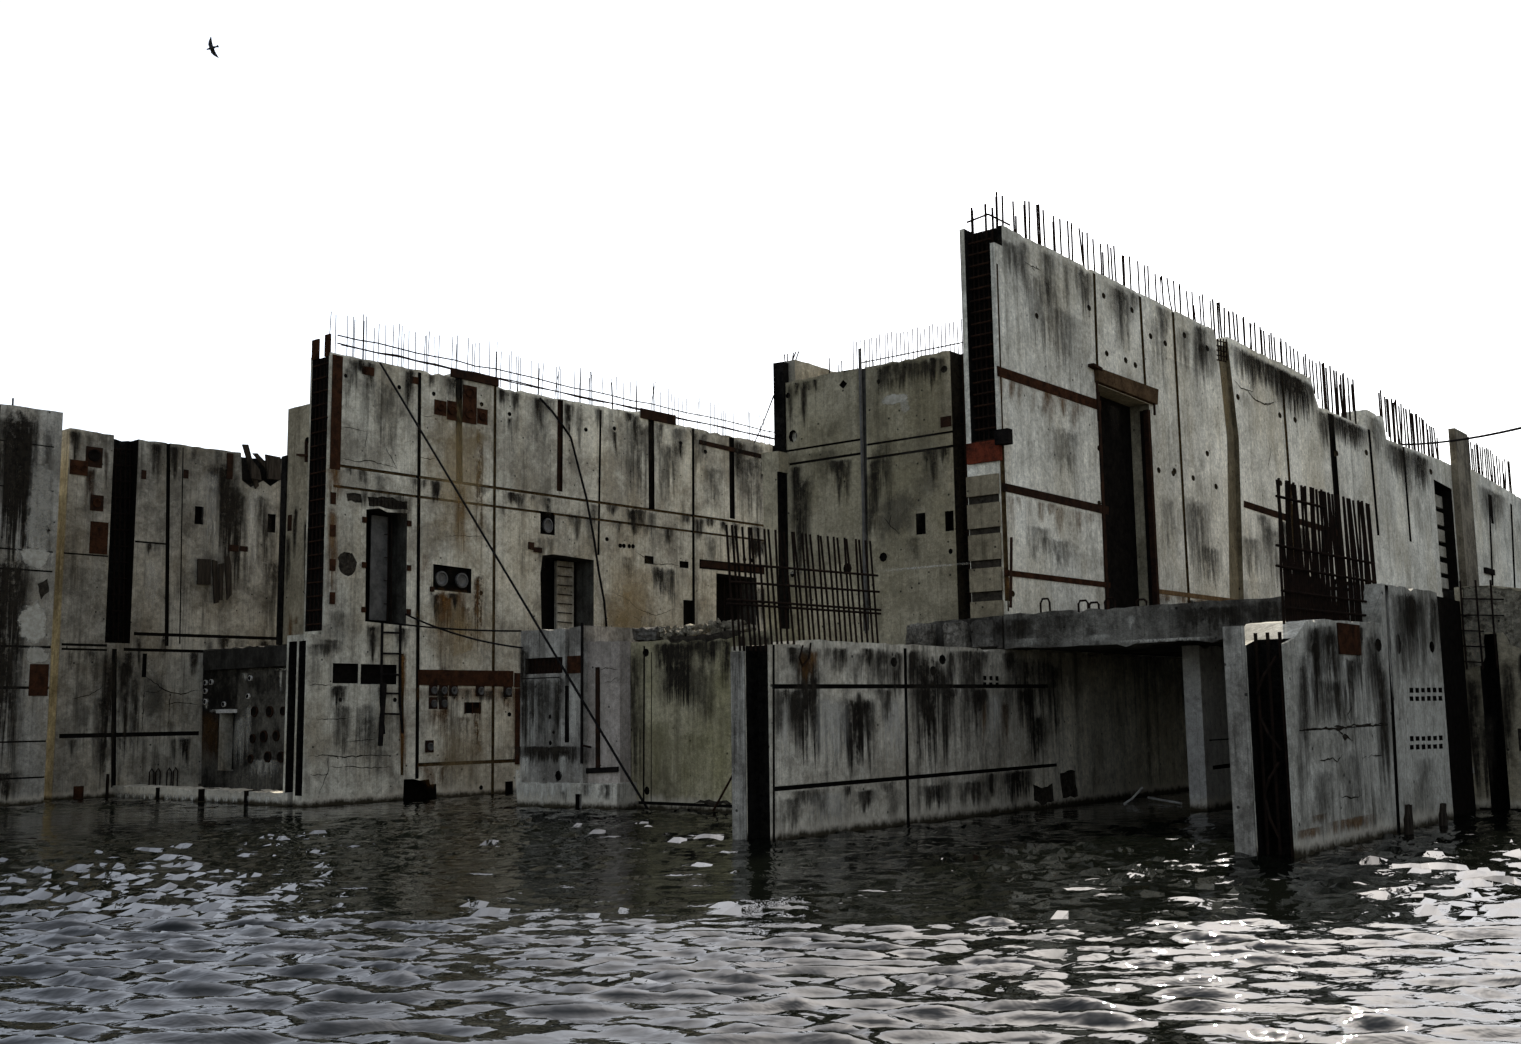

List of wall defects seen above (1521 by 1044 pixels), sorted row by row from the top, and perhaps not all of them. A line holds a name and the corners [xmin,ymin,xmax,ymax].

leakage [788,380,816,423]
leakage [878,358,944,405]
leakage [1184,329,1209,381]
leakage [153,444,177,473]
corrosion [455,434,483,541]
leakage [0,412,51,800]
corrosion [439,576,483,643]
leakage [94,639,162,772]
leakage [630,657,641,772]
leakage [655,636,769,715]
leakage [776,620,1060,812]
leakage [1468,654,1521,798]